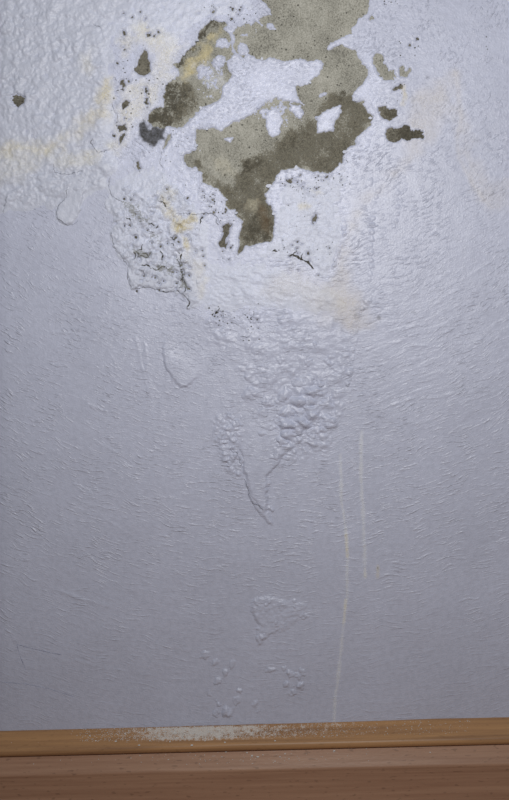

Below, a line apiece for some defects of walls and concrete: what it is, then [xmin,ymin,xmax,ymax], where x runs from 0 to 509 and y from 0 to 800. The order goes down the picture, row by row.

peeling [12,95,25,107]
peeling [104,0,424,341]